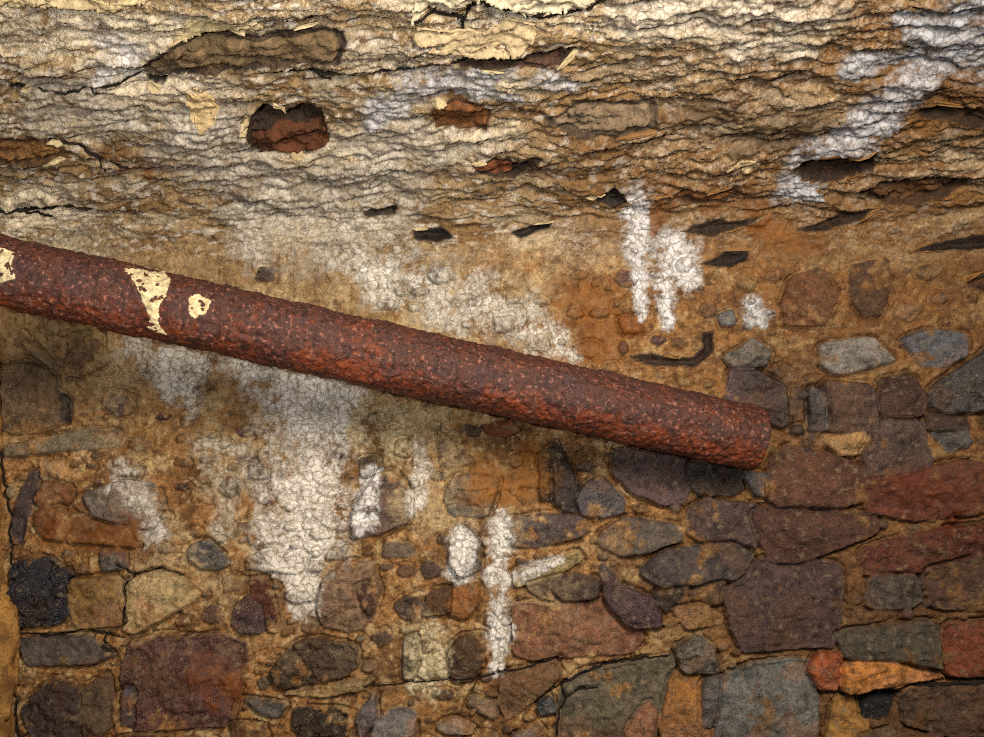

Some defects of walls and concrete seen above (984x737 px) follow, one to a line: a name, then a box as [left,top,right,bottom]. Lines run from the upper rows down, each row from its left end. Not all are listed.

crack [409,0,605,29]
crack [39,71,142,96]
crack [44,138,153,172]
peeling [185,87,220,135]
spalling [137,18,350,94]
spalling [239,100,331,161]
damp [737,0,984,202]
crack [0,204,94,217]
rust [649,177,680,238]
damp [620,183,703,332]
damp [123,336,433,623]
damp [444,506,565,678]